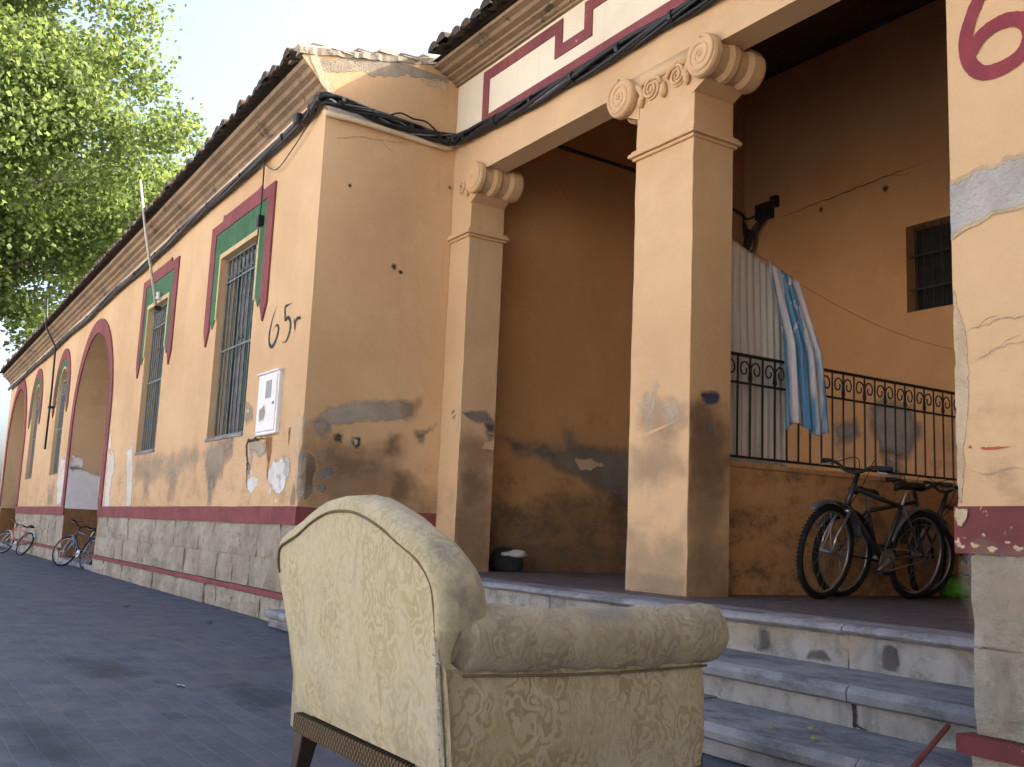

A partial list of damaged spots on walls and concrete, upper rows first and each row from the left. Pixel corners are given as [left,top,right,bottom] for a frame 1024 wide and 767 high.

flaking render [310,54,449,136]
crack [781,157,938,217]
spalling [950,152,1024,240]
crack [965,315,1024,363]
peeling [48,431,135,510]
water stain [137,439,232,502]
spalling [247,414,337,506]
water stain [512,438,629,508]
peeling [957,533,1024,552]